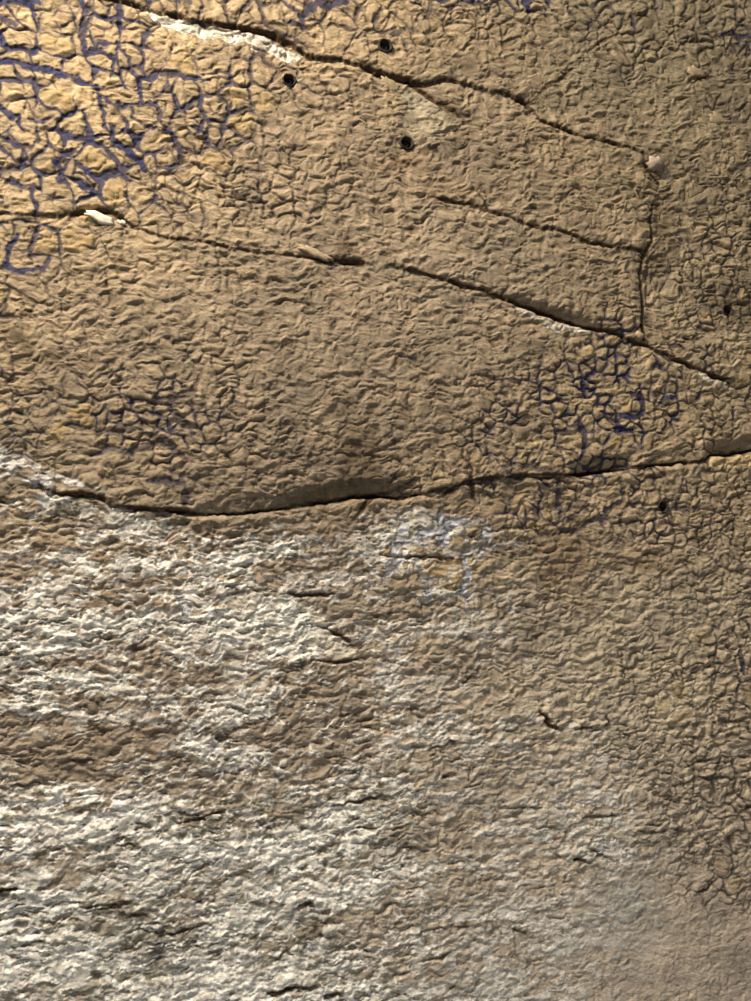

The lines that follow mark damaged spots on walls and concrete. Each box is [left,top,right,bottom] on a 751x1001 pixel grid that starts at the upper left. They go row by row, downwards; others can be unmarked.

spalling [145,12,300,63]
flaking render [84,210,126,225]
crack [0,207,364,266]
crack [111,0,738,389]
damp [15,495,83,515]
crack [38,449,751,519]
damp [0,507,639,1001]